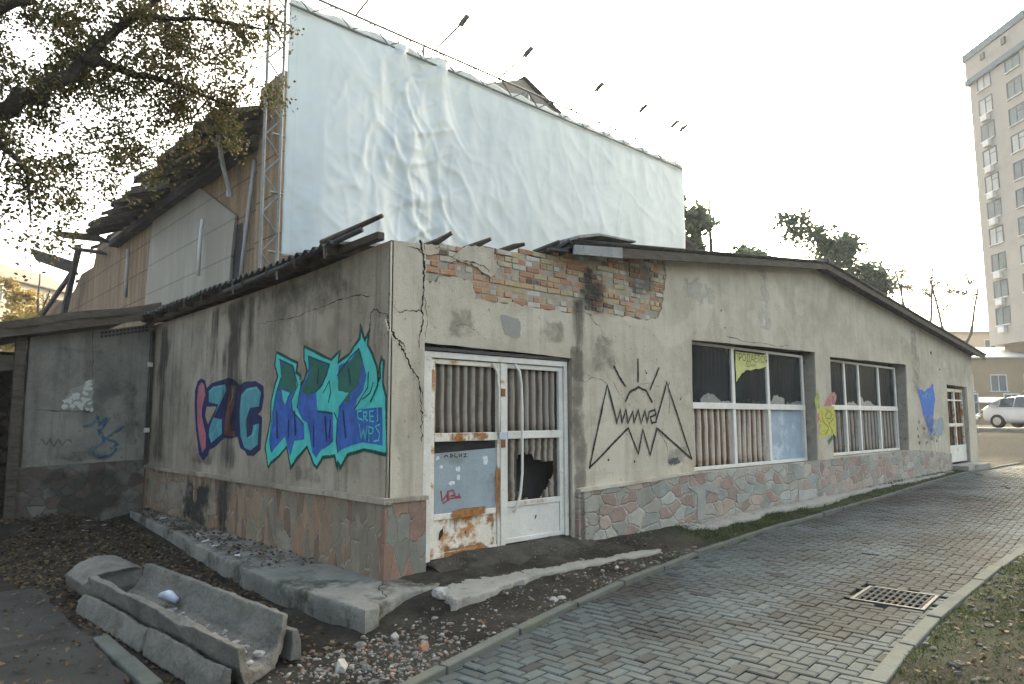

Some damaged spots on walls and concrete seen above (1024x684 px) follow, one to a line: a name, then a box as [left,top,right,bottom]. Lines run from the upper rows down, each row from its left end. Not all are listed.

flaking render [420,243,668,319]
leakage [155,329,168,458]
leakage [212,302,252,460]
crack [259,240,489,443]
corrosion [451,433,488,442]
leakage [218,481,227,532]
corrosion [444,467,500,558]